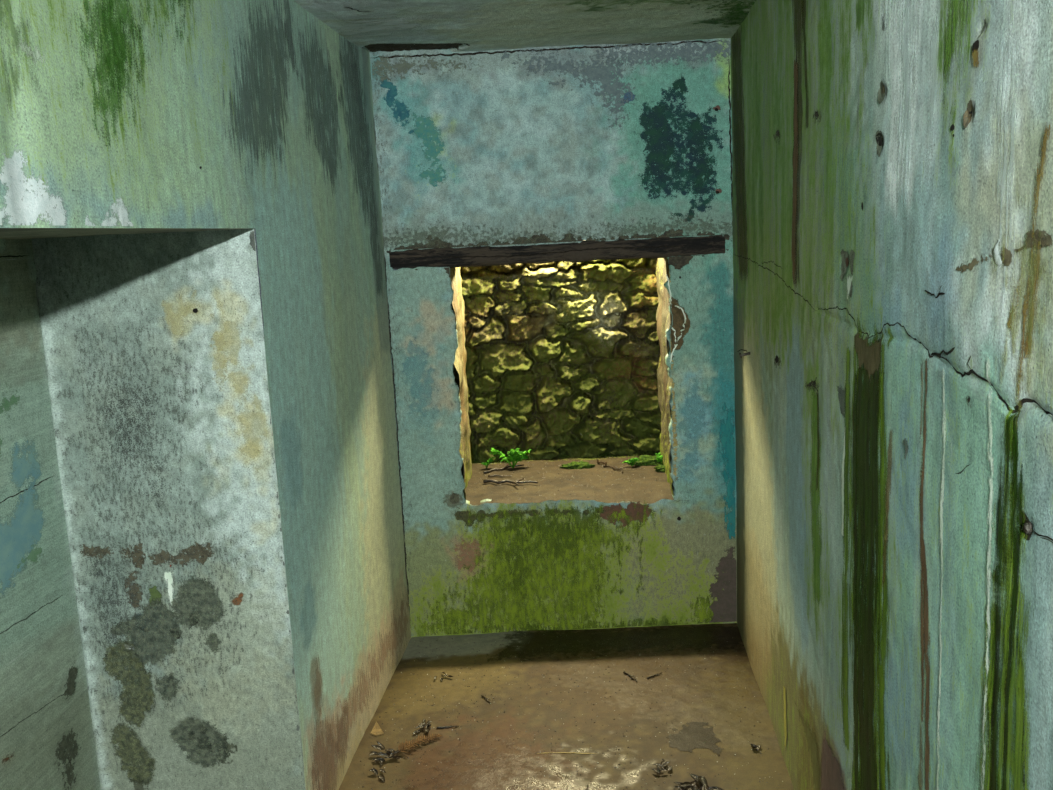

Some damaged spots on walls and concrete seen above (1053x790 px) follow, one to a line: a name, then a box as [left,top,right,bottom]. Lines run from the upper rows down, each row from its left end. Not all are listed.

peeling [0,145,67,226]
peeling [85,198,133,226]
leakage [501,29,748,279]
crack [375,40,1052,415]
spalling [875,130,883,157]
spalling [878,81,886,104]
crack [0,476,53,503]
crack [0,595,63,634]
leakage [79,542,216,657]
leakage [837,335,890,790]
rust [918,359,930,790]
leakage [981,359,1024,790]